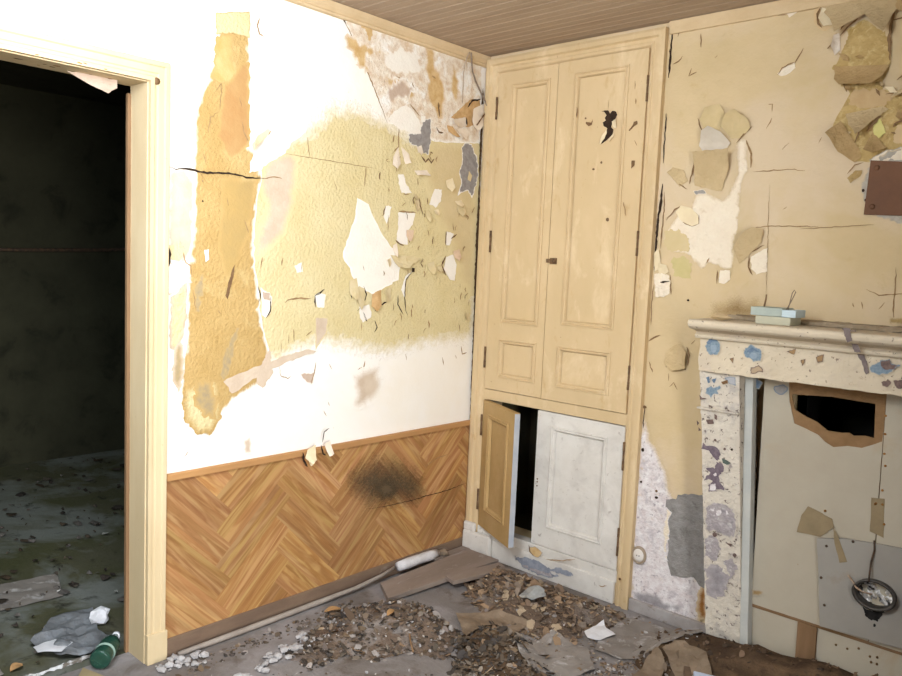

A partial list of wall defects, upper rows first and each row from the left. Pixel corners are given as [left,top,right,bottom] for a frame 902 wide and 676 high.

peeling [576,101,617,144]
crack [171,167,280,179]
peeling [223,20,483,411]
spalling [654,104,768,298]
peeling [168,167,194,393]
peeling [697,377,736,431]
water stain [354,466,418,500]
peeling [631,406,738,621]
peeling [515,546,575,578]